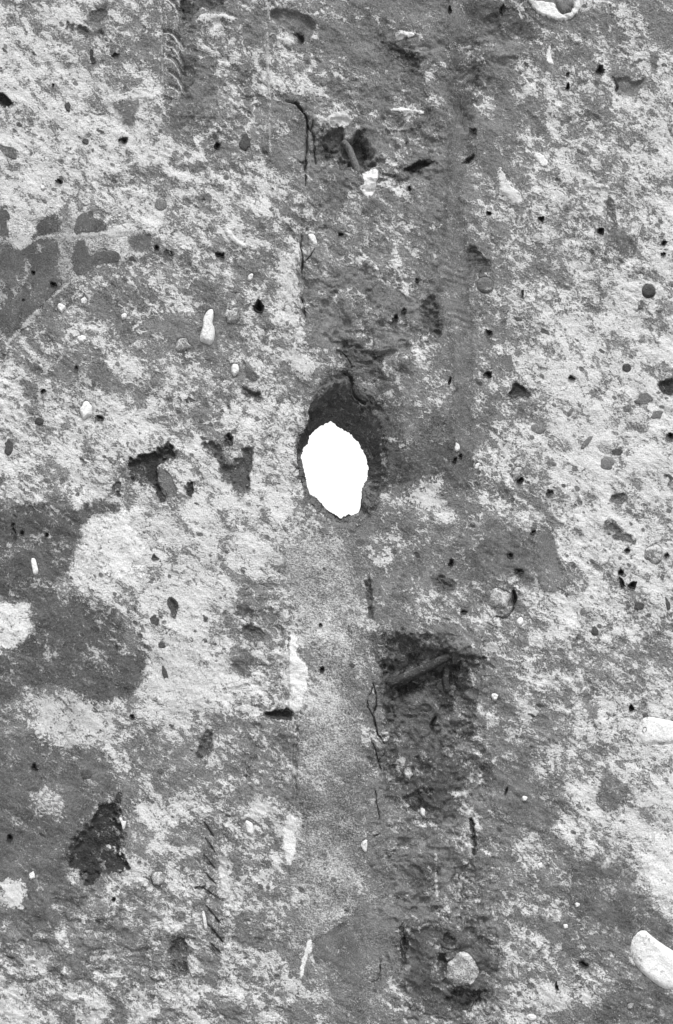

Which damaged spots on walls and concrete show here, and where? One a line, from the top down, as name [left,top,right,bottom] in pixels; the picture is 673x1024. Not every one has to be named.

crack [287,101,316,186]
crack [300,236,315,318]
spalling [111,441,178,502]
spalling [201,432,255,494]
spalling [287,332,392,528]
spalling [65,791,131,886]